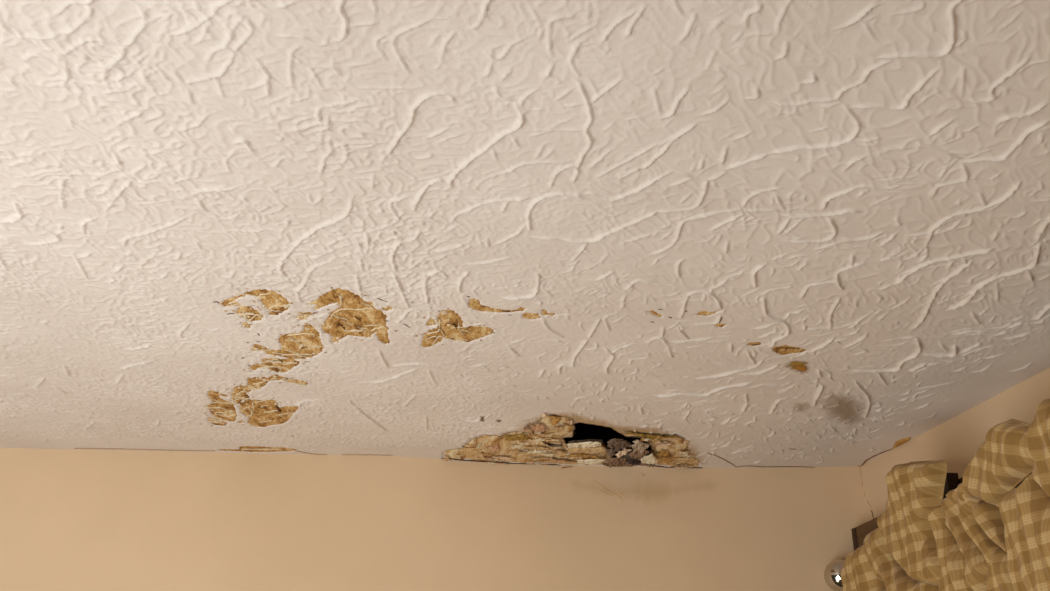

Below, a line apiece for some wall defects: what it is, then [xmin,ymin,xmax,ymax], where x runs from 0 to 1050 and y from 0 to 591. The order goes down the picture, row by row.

peeling [202,287,561,429]
peeling [220,436,297,452]
flaking render [441,413,699,469]